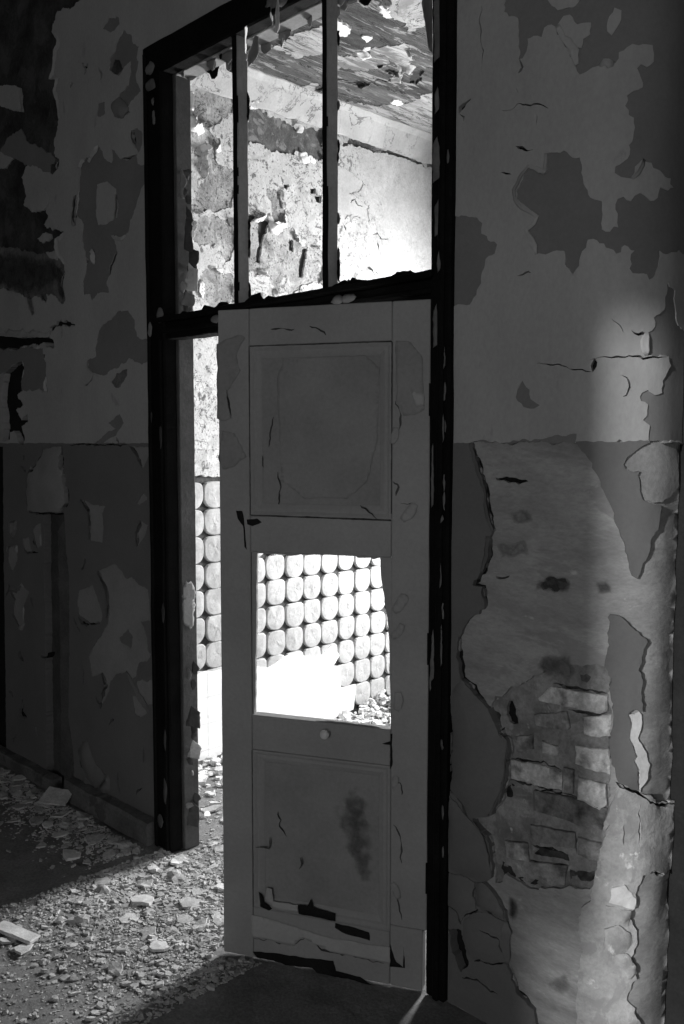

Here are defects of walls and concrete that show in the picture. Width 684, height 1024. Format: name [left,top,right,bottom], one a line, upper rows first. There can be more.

flaking render [0,0,80,304]
peeling [76,128,144,300]
peeling [103,17,156,125]
peeling [179,51,367,323]
peeling [454,216,497,306]
peeling [505,0,684,279]
peeling [0,328,54,440]
peeling [86,307,163,388]
crack [547,332,661,397]
peeling [78,564,165,717]
flaking render [459,284,684,1024]
peeling [251,888,390,964]